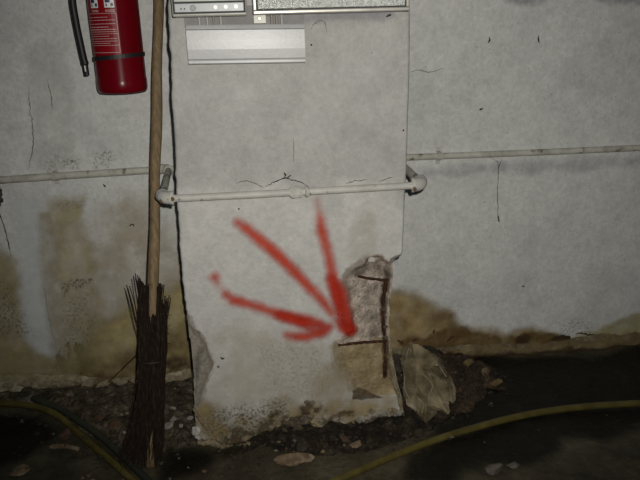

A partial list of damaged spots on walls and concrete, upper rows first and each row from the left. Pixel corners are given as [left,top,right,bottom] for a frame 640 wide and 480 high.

crack [27,99,35,169]
water stain [0,257,61,379]
water stain [44,203,149,388]
water stain [162,258,193,374]
spalling [333,254,413,424]
water stain [389,292,568,357]
spalling [436,332,640,356]
water stain [577,314,640,337]
spalling [165,312,251,450]
water stain [197,401,391,444]
spalling [272,413,318,432]